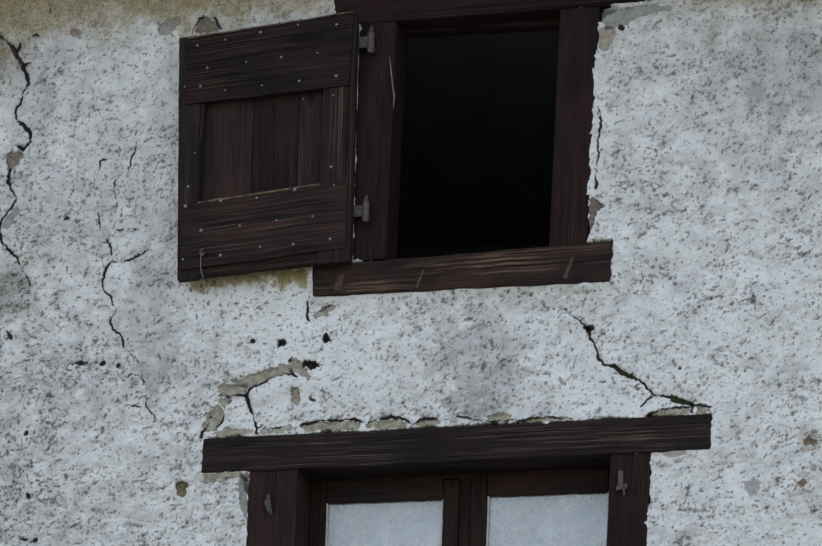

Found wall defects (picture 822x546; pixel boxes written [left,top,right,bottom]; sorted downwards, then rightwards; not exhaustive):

flaking render [598,3,672,51]
crack [0,33,40,287]
crack [97,131,156,419]
flaking render [202,358,440,438]
crack [199,357,572,439]
flaking render [484,412,512,425]
crack [564,308,712,417]
flaking render [645,406,710,417]